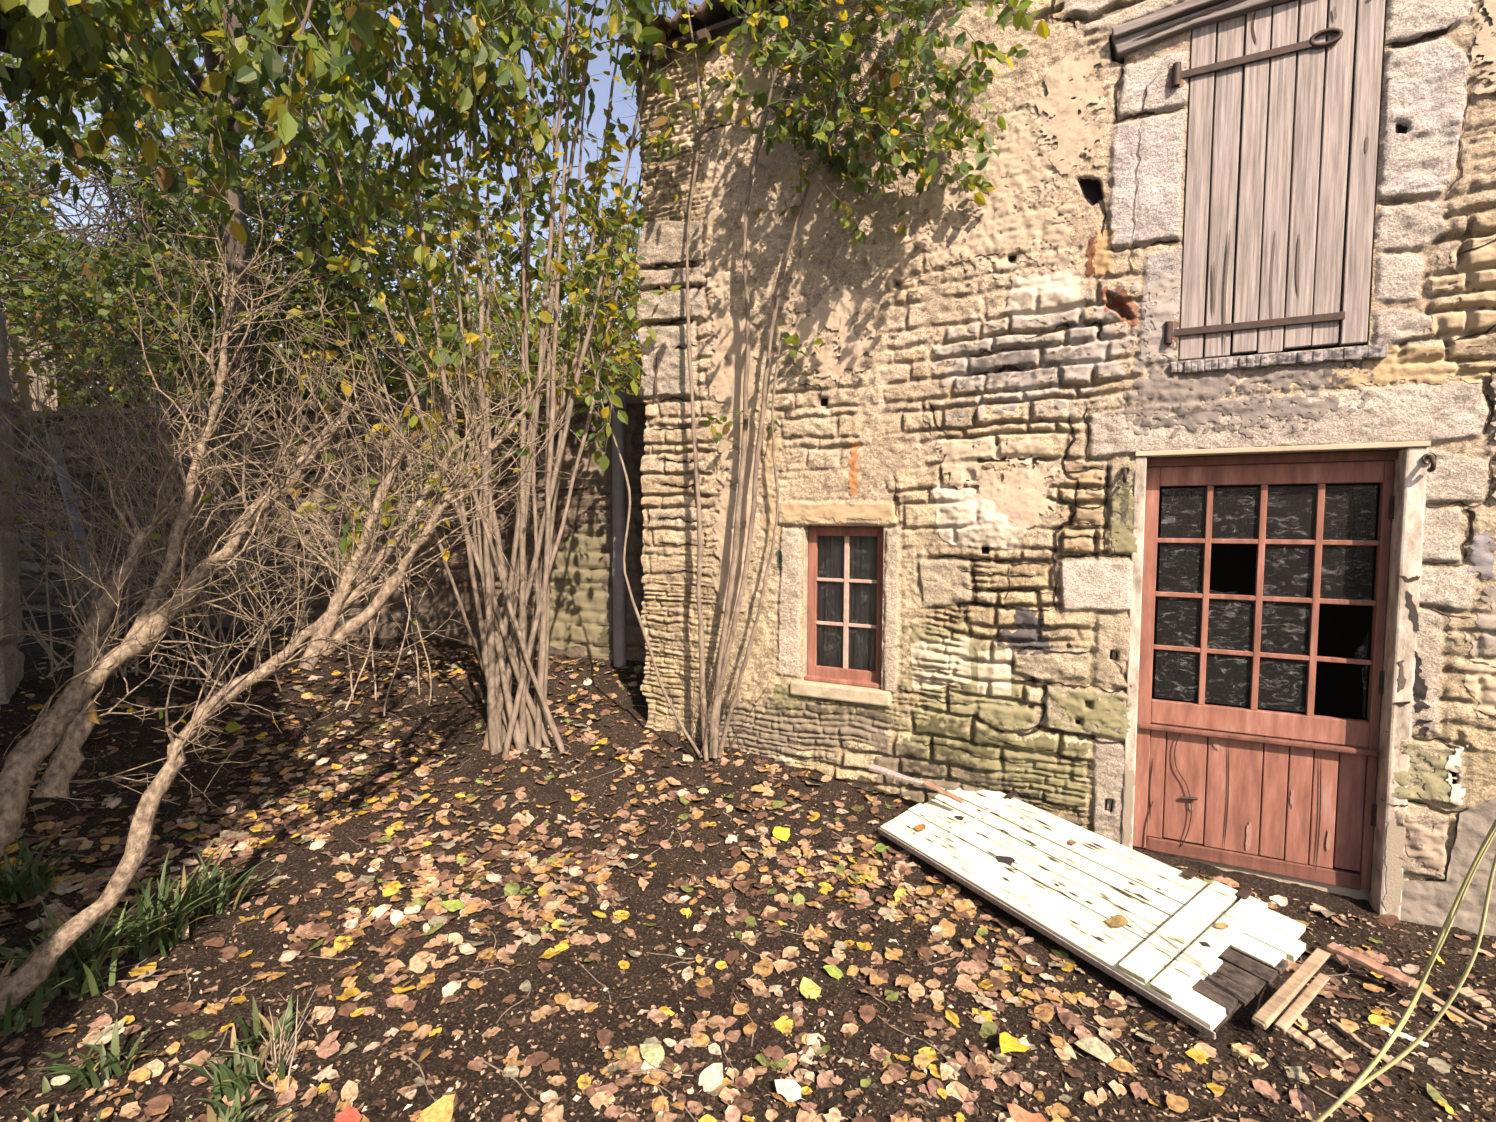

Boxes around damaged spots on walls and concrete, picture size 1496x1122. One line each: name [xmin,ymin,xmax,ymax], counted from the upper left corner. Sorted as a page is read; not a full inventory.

flaking render [1471,0,1496,94]
corrosion [1085,228,1139,325]
spalling [1322,219,1496,450]
crack [894,400,1139,815]
spalling [1447,585,1496,724]
leakage [694,697,1095,833]
flaking render [1445,745,1468,806]
spalling [1402,819,1450,879]